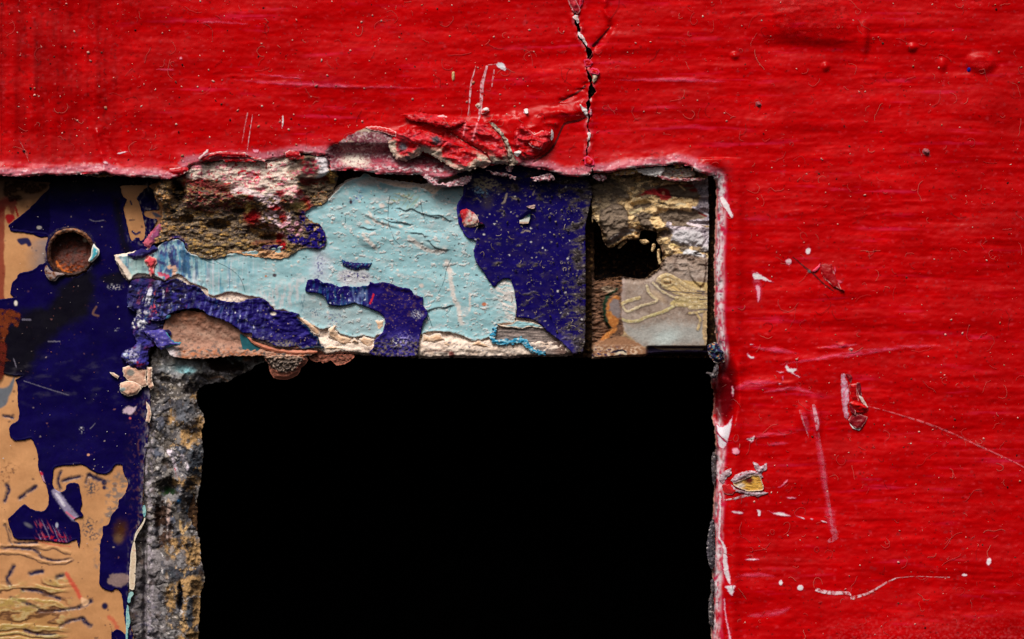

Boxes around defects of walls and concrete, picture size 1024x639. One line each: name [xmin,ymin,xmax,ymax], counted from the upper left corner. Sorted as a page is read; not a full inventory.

spalling [82,151,128,177]
crack [533,0,610,183]
peeling [110,107,705,423]